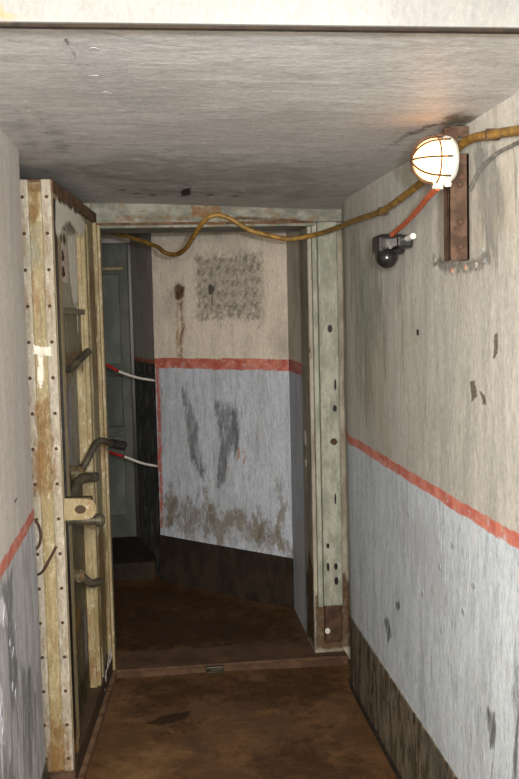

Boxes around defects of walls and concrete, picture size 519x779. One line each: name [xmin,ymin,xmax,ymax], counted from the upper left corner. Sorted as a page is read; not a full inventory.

corrosion [175,284,185,356]
corrosion [34,400,54,494]
leakage [183,393,203,477]
leakage [215,402,239,482]
leakage [21,667,36,779]
leakage [487,709,496,747]